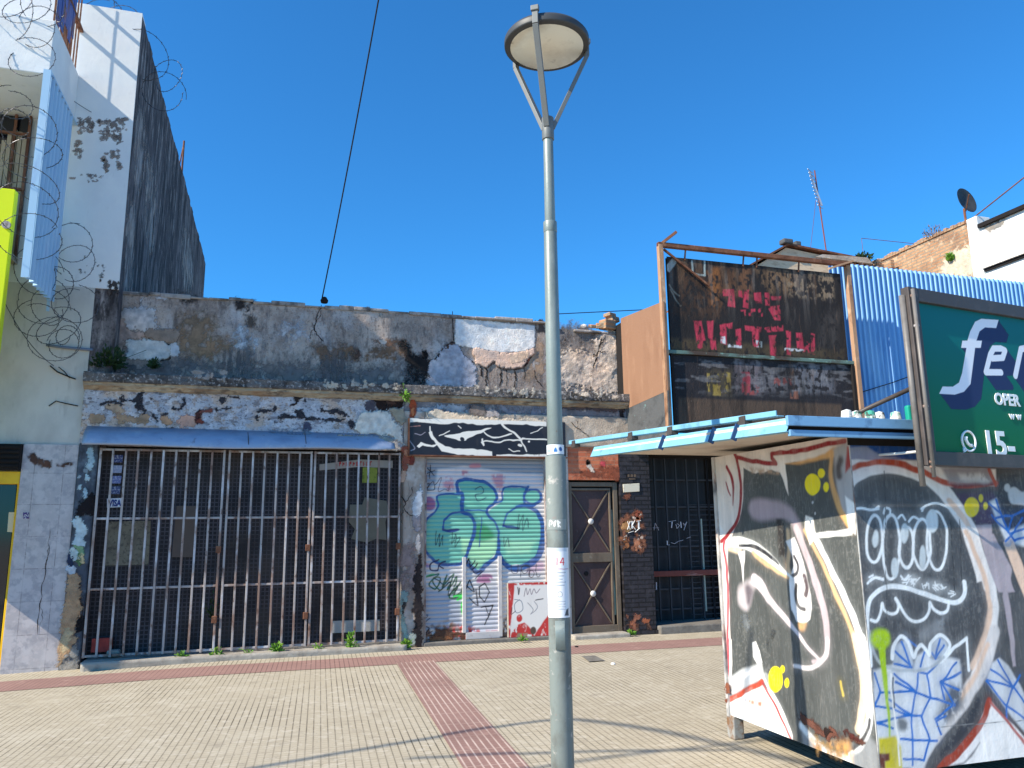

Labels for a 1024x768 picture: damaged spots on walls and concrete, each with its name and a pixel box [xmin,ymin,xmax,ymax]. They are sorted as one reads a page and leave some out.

peeling [70,116,129,183]
peeling [89,392,240,429]
damp [117,300,429,385]
peeling [255,397,415,482]
flaking render [323,343,547,425]
crack [434,311,543,387]
peeling [65,447,99,575]
crack [37,537,50,635]
peeling [58,628,79,670]